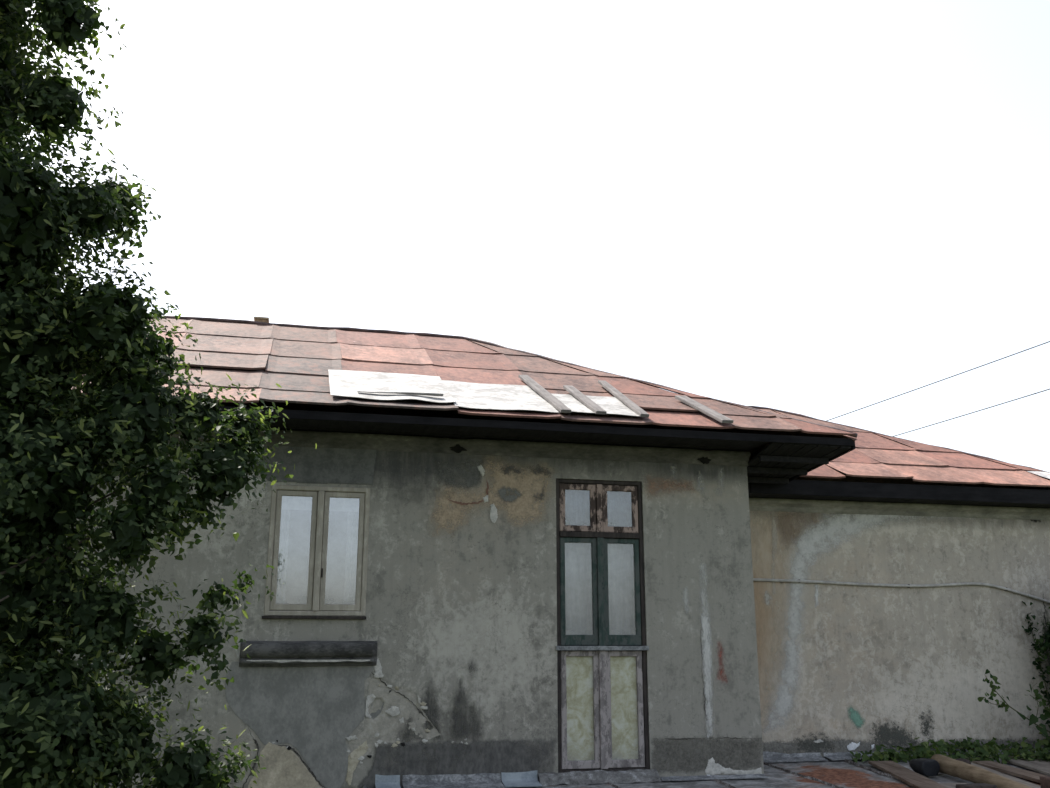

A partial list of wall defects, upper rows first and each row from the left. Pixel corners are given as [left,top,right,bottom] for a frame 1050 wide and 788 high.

flaking render [433,460,551,532]
flaking render [235,643,441,788]
crack [218,728,260,788]